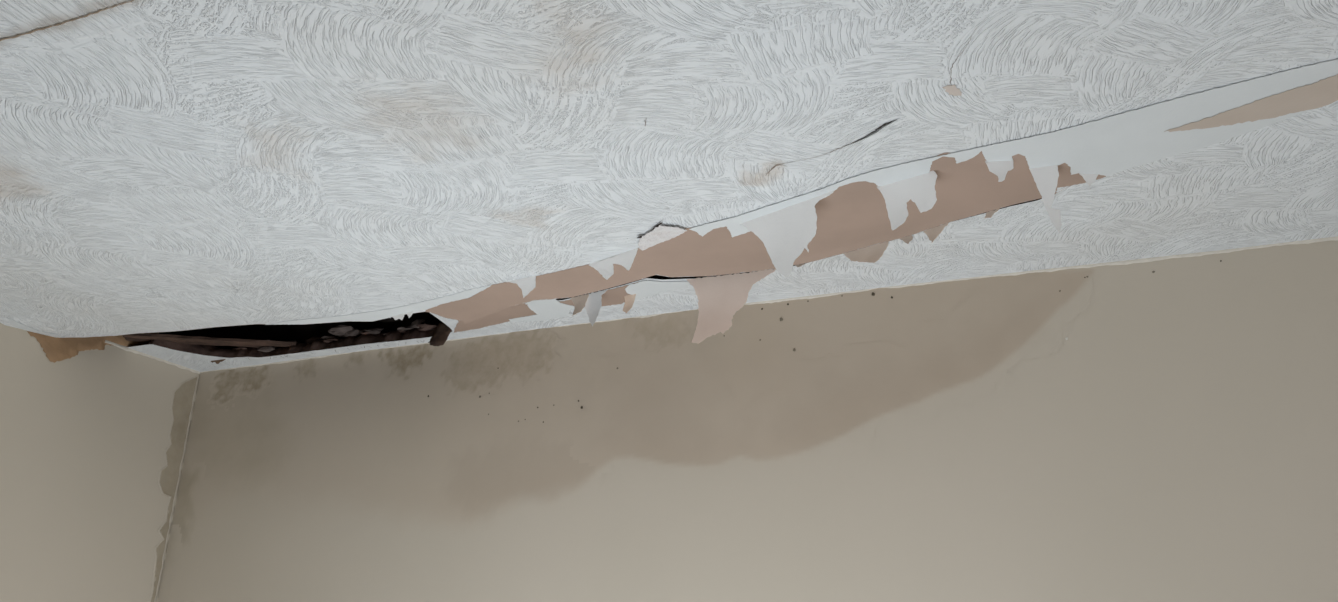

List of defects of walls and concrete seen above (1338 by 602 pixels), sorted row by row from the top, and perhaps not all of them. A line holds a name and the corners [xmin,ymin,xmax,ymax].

peeling [1164,74,1338,132]
peeling [793,151,1106,267]
peeling [266,225,776,344]
flaking render [27,331,159,363]
water stain [157,266,1100,602]